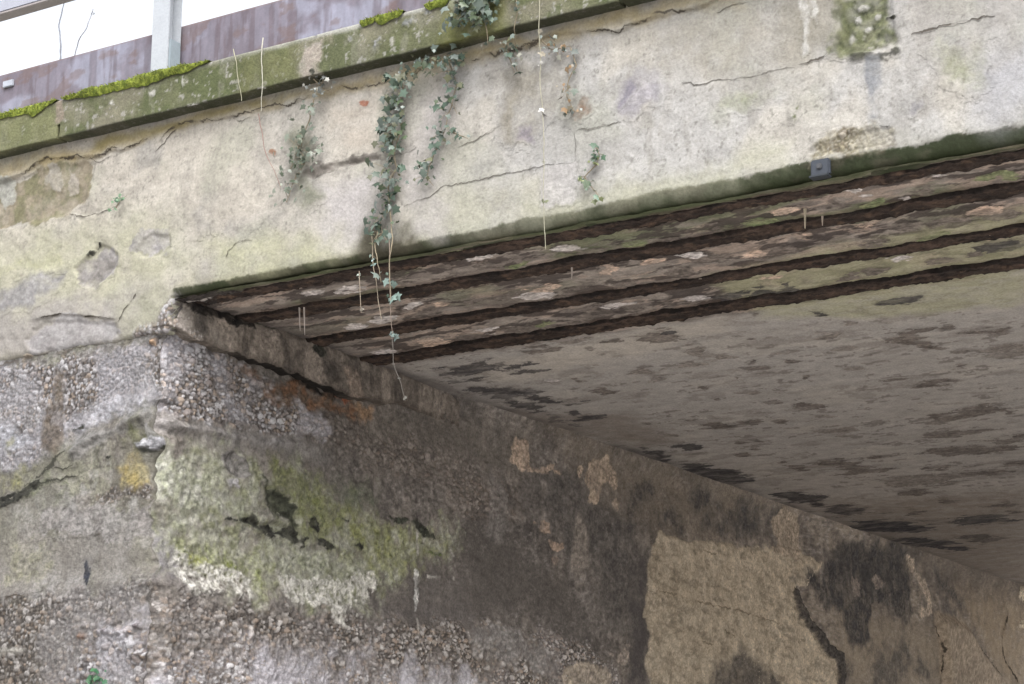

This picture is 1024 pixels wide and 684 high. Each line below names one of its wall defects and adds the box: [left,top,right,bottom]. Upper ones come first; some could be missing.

crack [587,0,745,34]
crack [911,15,993,35]
crack [20,95,308,174]
crack [421,121,619,200]
peeling [824,174,1024,282]
peeling [342,206,829,330]
peeling [411,274,802,347]
rust [234,358,376,428]
peeling [409,320,1024,527]
crack [0,451,77,512]
damp [482,446,1011,684]
peeling [793,585,847,684]